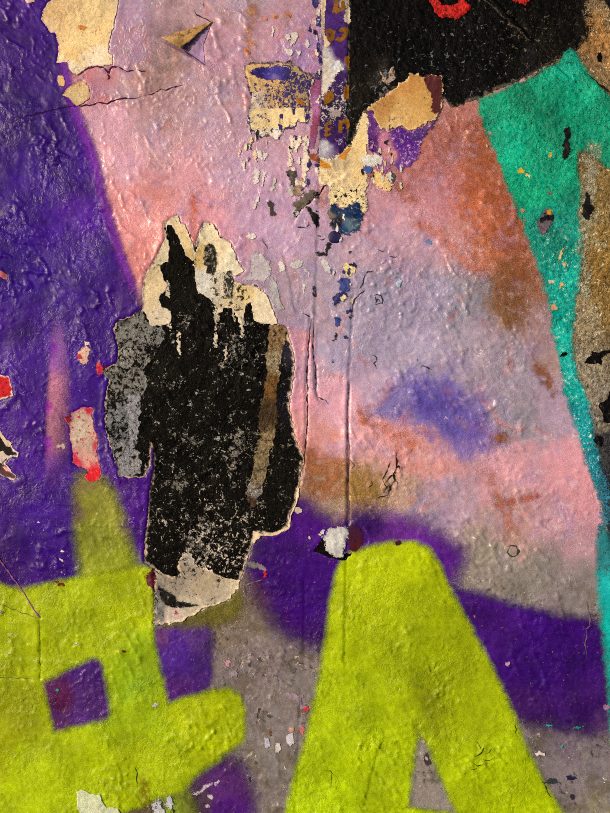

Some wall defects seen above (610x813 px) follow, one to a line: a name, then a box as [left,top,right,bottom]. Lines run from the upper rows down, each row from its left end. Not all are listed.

peeling [41,0,118,106]
crack [16,66,181,120]
peeling [379,67,396,85]
peeling [370,147,403,190]
peeling [56,407,101,482]
peeling [308,525,363,561]
peeling [246,561,267,578]